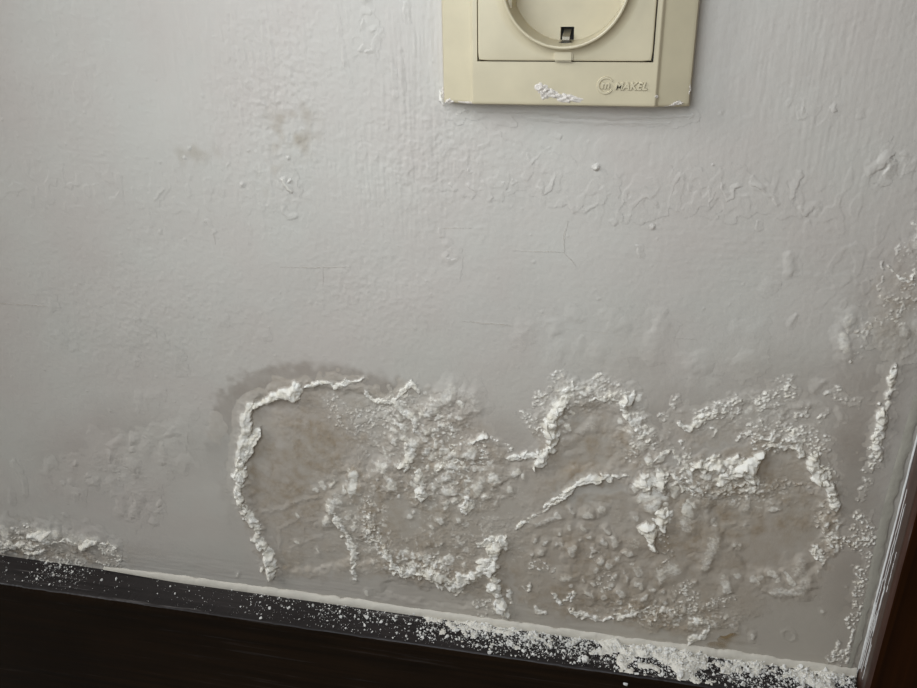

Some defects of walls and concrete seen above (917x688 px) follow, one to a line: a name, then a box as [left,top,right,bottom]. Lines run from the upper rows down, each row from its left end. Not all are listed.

peeling [224,368,864,622]
efflorescence [819,201,917,668]